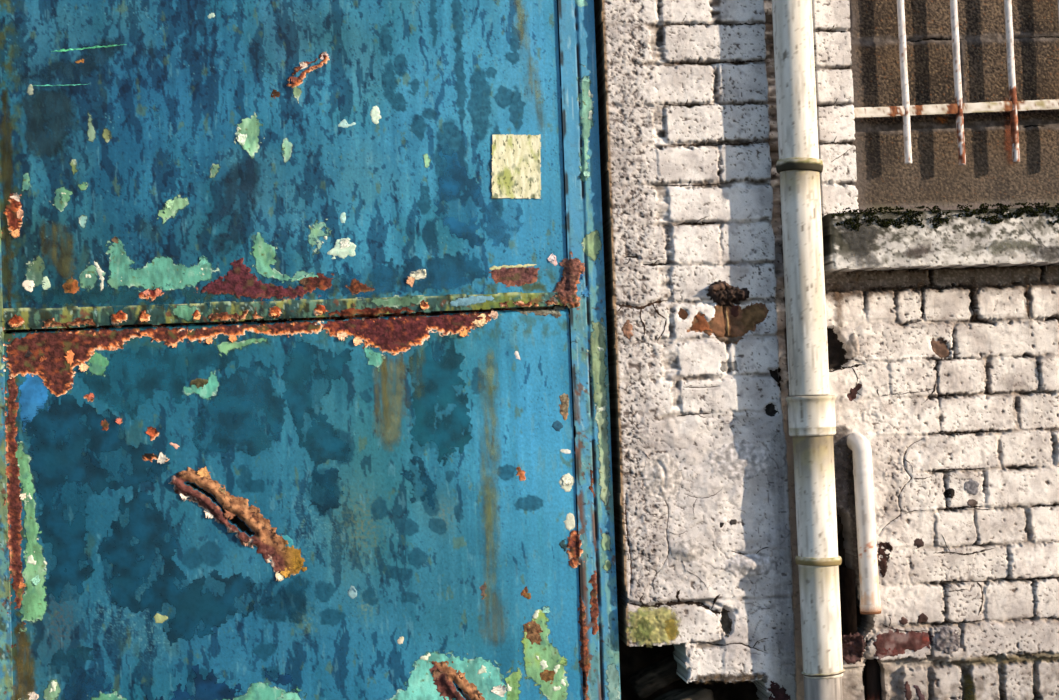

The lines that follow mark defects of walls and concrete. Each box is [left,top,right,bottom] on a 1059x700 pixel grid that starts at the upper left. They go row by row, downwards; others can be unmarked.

peeling [234,113,265,158]
peeling [79,236,219,292]
corrosion [0,91,590,614]
spalling [827,325,860,370]
crack [625,489,768,653]
corrosion [11,621,34,700]
peeling [20,679,61,700]
peeling [216,678,307,700]
peeling [390,601,569,700]
corrosion [522,620,544,647]
corrosion [540,670,556,684]
corrosion [559,524,600,700]